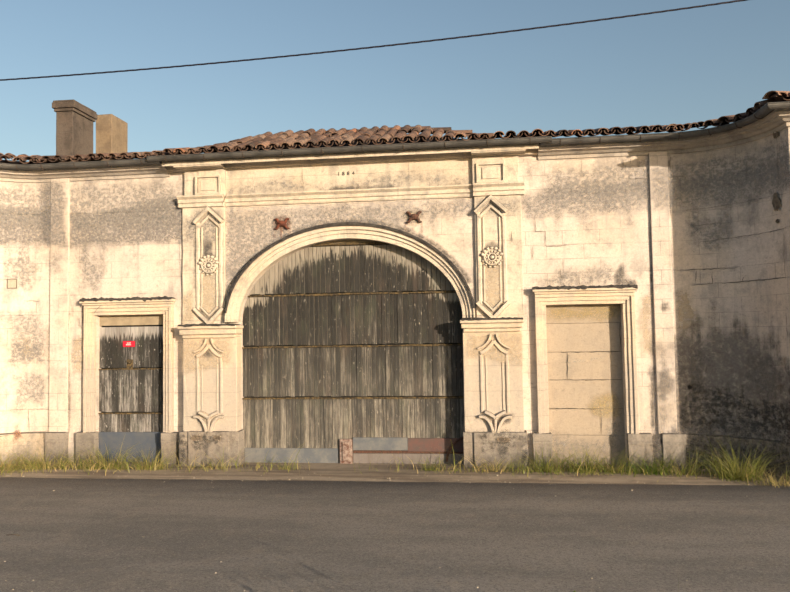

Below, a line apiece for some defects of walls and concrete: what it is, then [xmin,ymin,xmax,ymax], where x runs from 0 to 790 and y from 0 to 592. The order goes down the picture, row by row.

water stain [526,142,790,218]
spalling [772,192,782,223]
water stain [653,294,790,475]